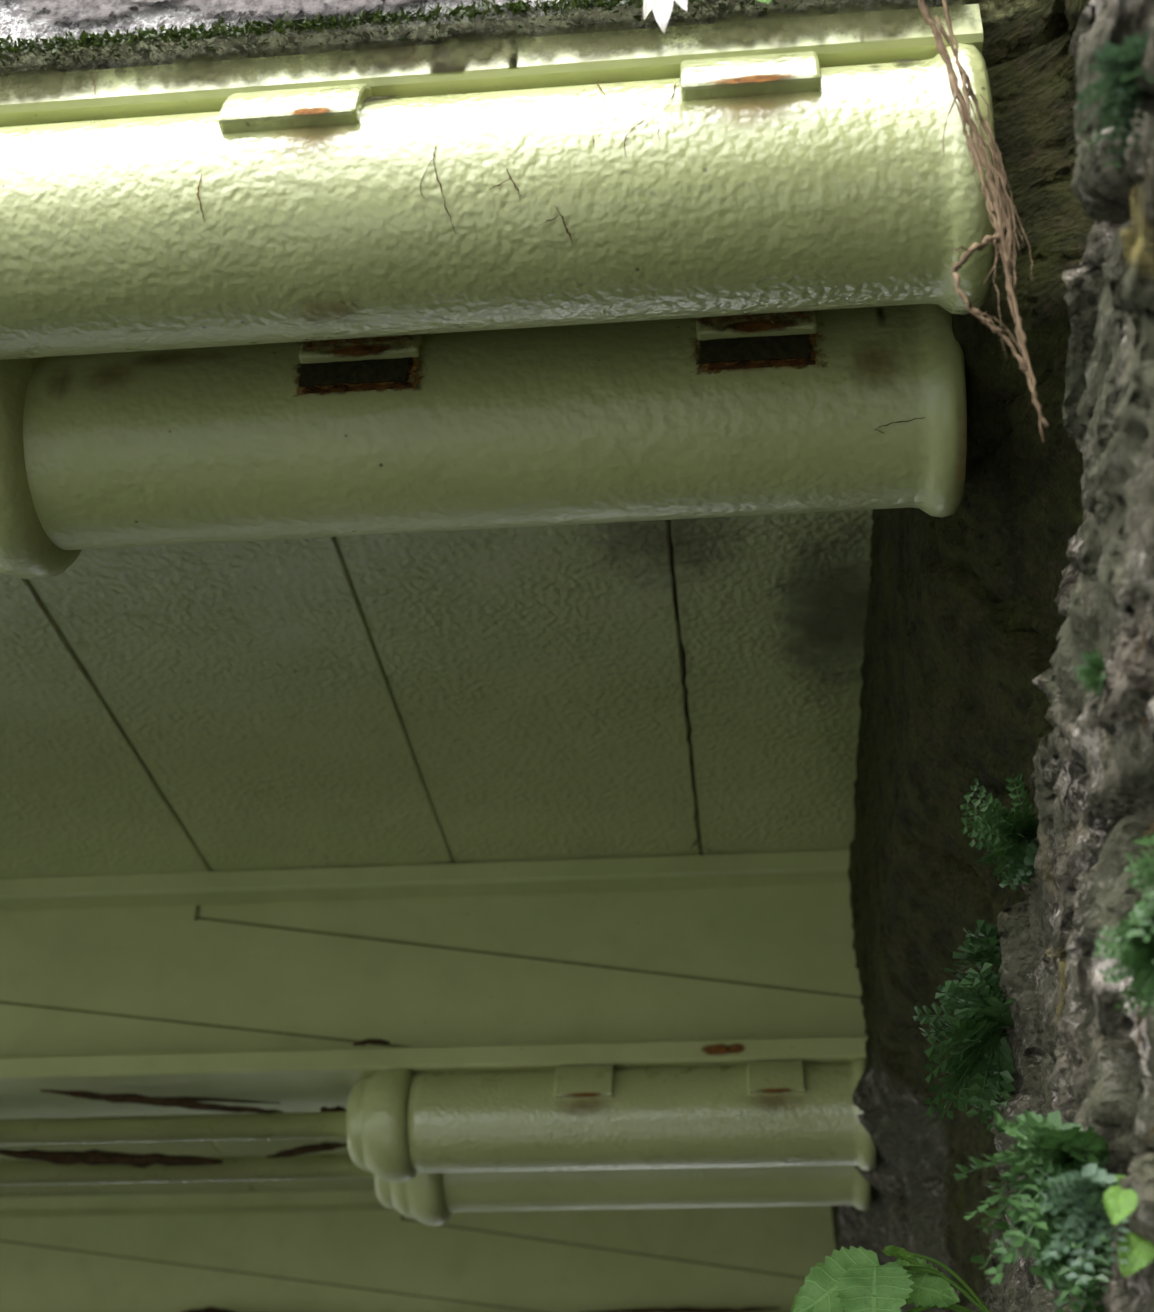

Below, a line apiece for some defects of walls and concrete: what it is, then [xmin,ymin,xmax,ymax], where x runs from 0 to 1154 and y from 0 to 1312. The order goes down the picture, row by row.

rust [710,74,792,84]
rust [289,107,331,115]
rust [702,1044,744,1055]